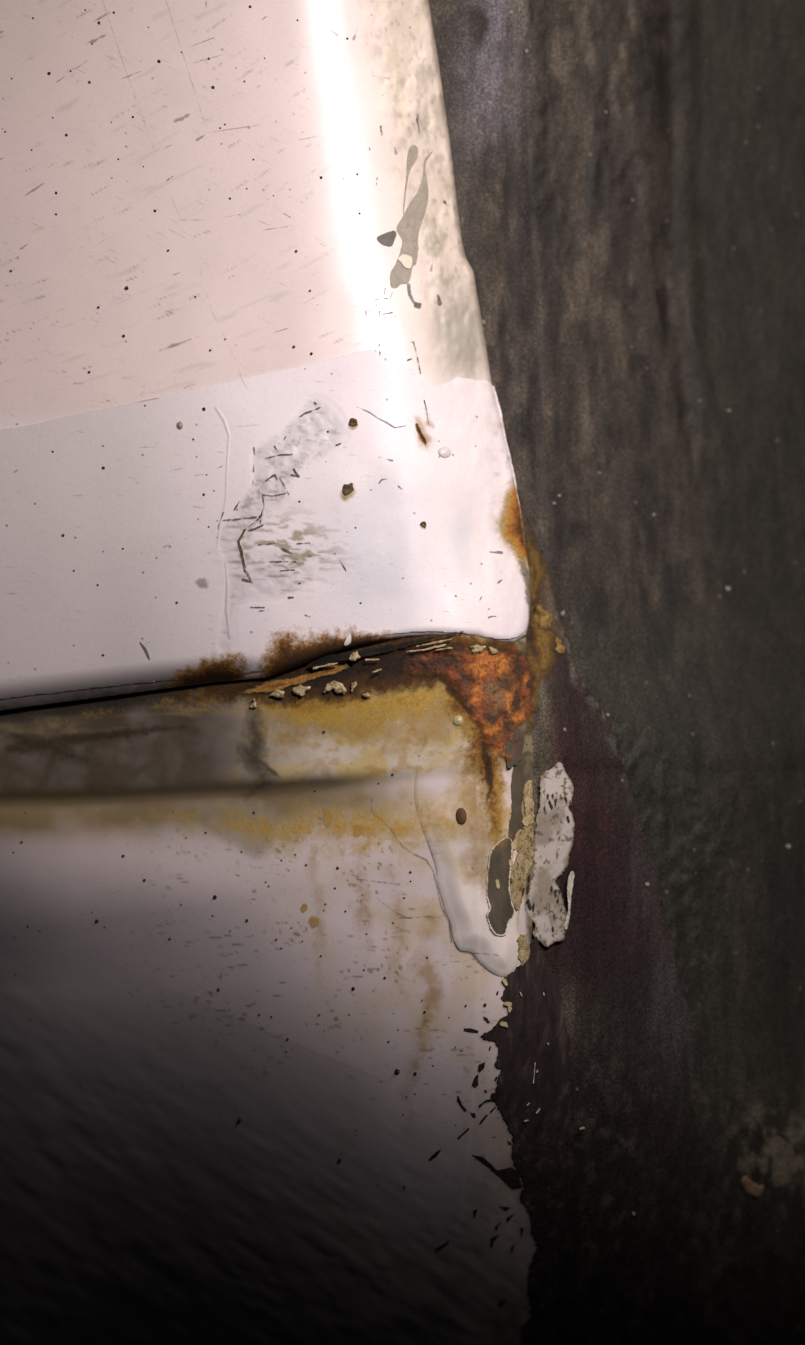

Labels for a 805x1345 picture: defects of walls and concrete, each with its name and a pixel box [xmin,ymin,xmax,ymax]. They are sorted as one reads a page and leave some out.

peeling [377,145,432,308]
crack [217,402,346,617]
damp [7,726,170,759]
damp [244,721,277,777]
damp [190,805,453,851]
rust [160,485,555,848]
peeling [457,762,585,1345]